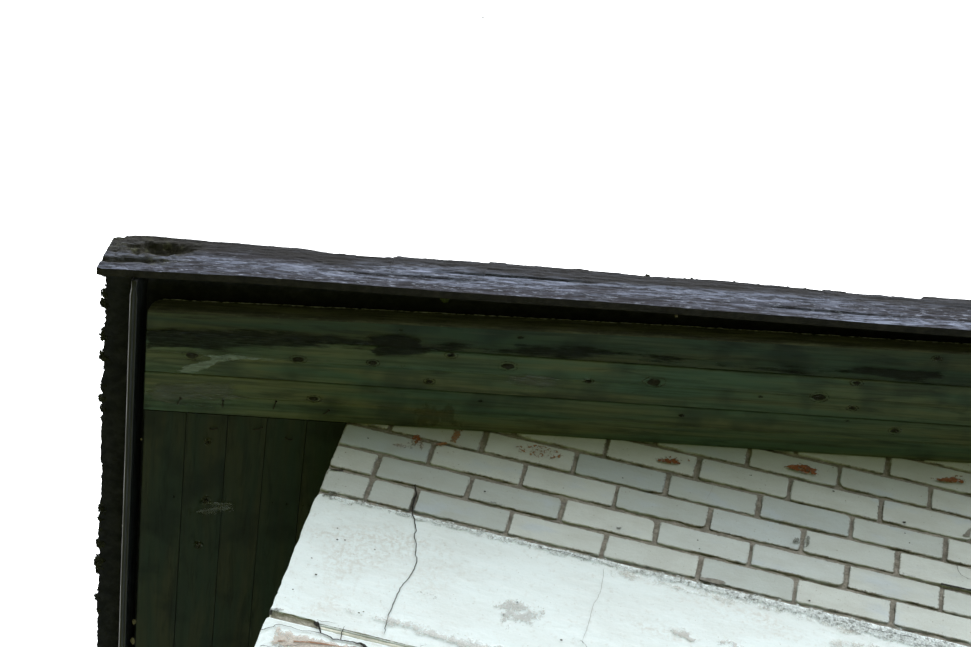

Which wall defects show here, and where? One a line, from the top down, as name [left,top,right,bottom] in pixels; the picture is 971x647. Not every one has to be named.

corrosion [784,463,817,475]
corrosion [931,475,964,483]
crack [261,484,417,647]
spalling [330,492,959,647]
peeling [269,608,349,647]